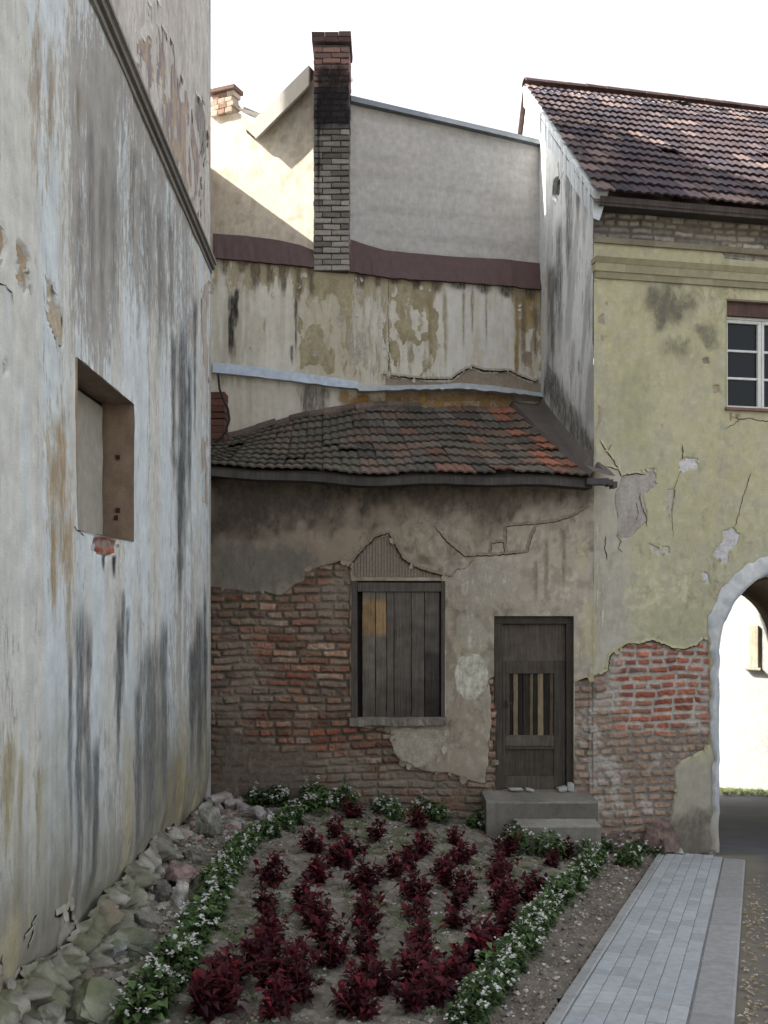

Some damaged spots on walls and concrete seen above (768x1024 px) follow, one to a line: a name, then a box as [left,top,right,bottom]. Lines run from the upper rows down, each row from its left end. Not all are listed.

peeling [135,0,210,219]
peeling [381,285,541,402]
crack [382,281,541,382]
leakage [522,177,579,350]
flaking render [91,537,120,556]
crack [327,504,589,577]
crack [600,439,647,559]
leakage [69,619,99,868]
leakage [117,602,129,743]
leakage [135,628,167,840]
flaking render [211,558,499,826]
flaking render [556,634,711,843]